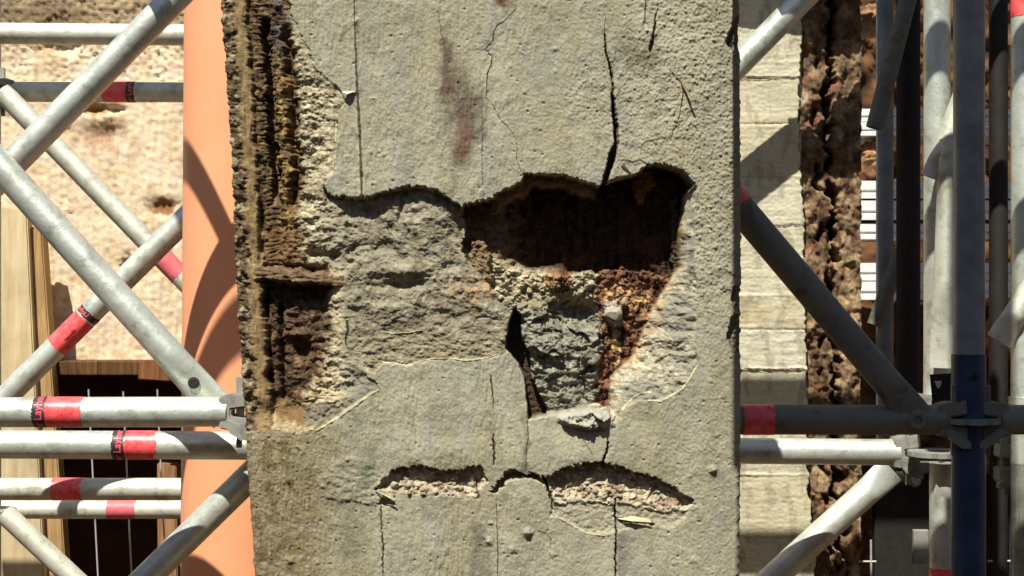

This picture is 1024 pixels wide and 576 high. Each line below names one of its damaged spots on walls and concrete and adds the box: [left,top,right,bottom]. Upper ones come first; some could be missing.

crack [353,0,362,195]
corrosion [442,41,480,162]
crack [463,8,521,184]
crack [602,0,694,184]
spalling [221,0,700,434]
spalling [374,461,695,536]
crack [612,531,620,576]